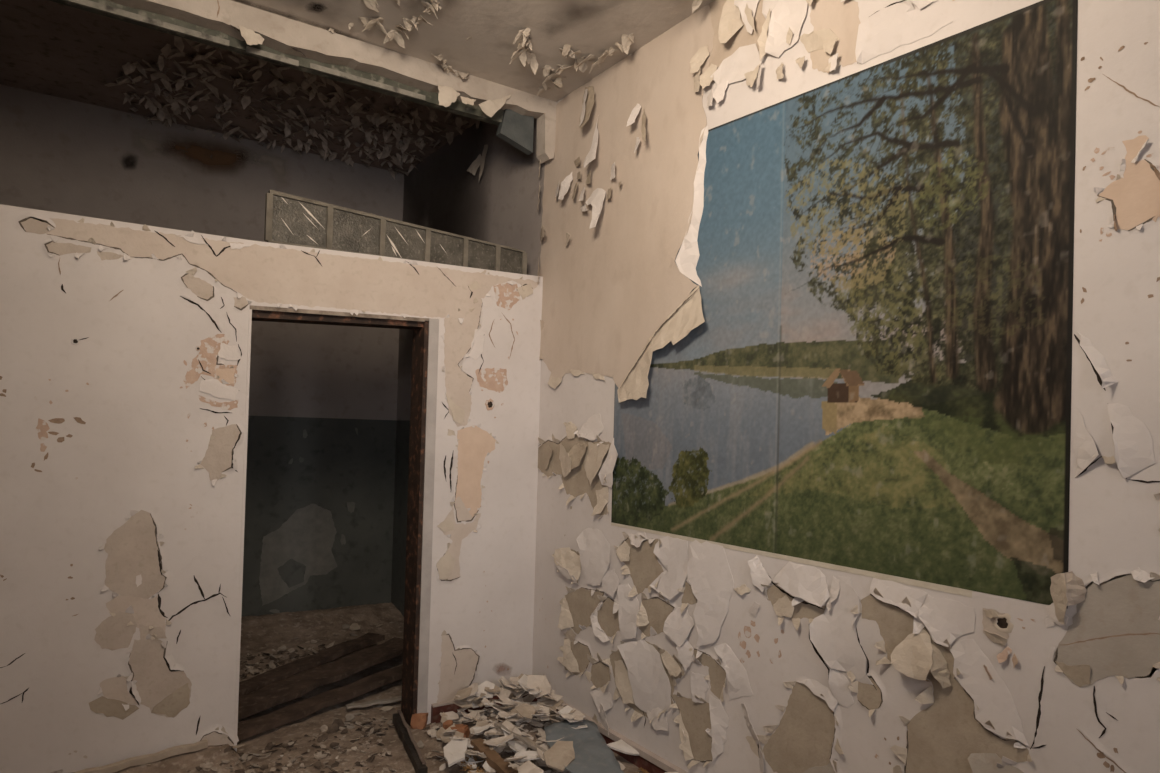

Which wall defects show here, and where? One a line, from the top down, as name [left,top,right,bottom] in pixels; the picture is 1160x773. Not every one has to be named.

peeling [1083,131,1160,242]
peeling [12,0,953,588]
peeling [1073,332,1160,532]
peeling [89,510,192,720]
crack [168,576,230,644]
peeling [538,413,1160,773]
peeling [194,717,239,749]
crack [1030,666,1053,753]
crack [1077,686,1137,773]